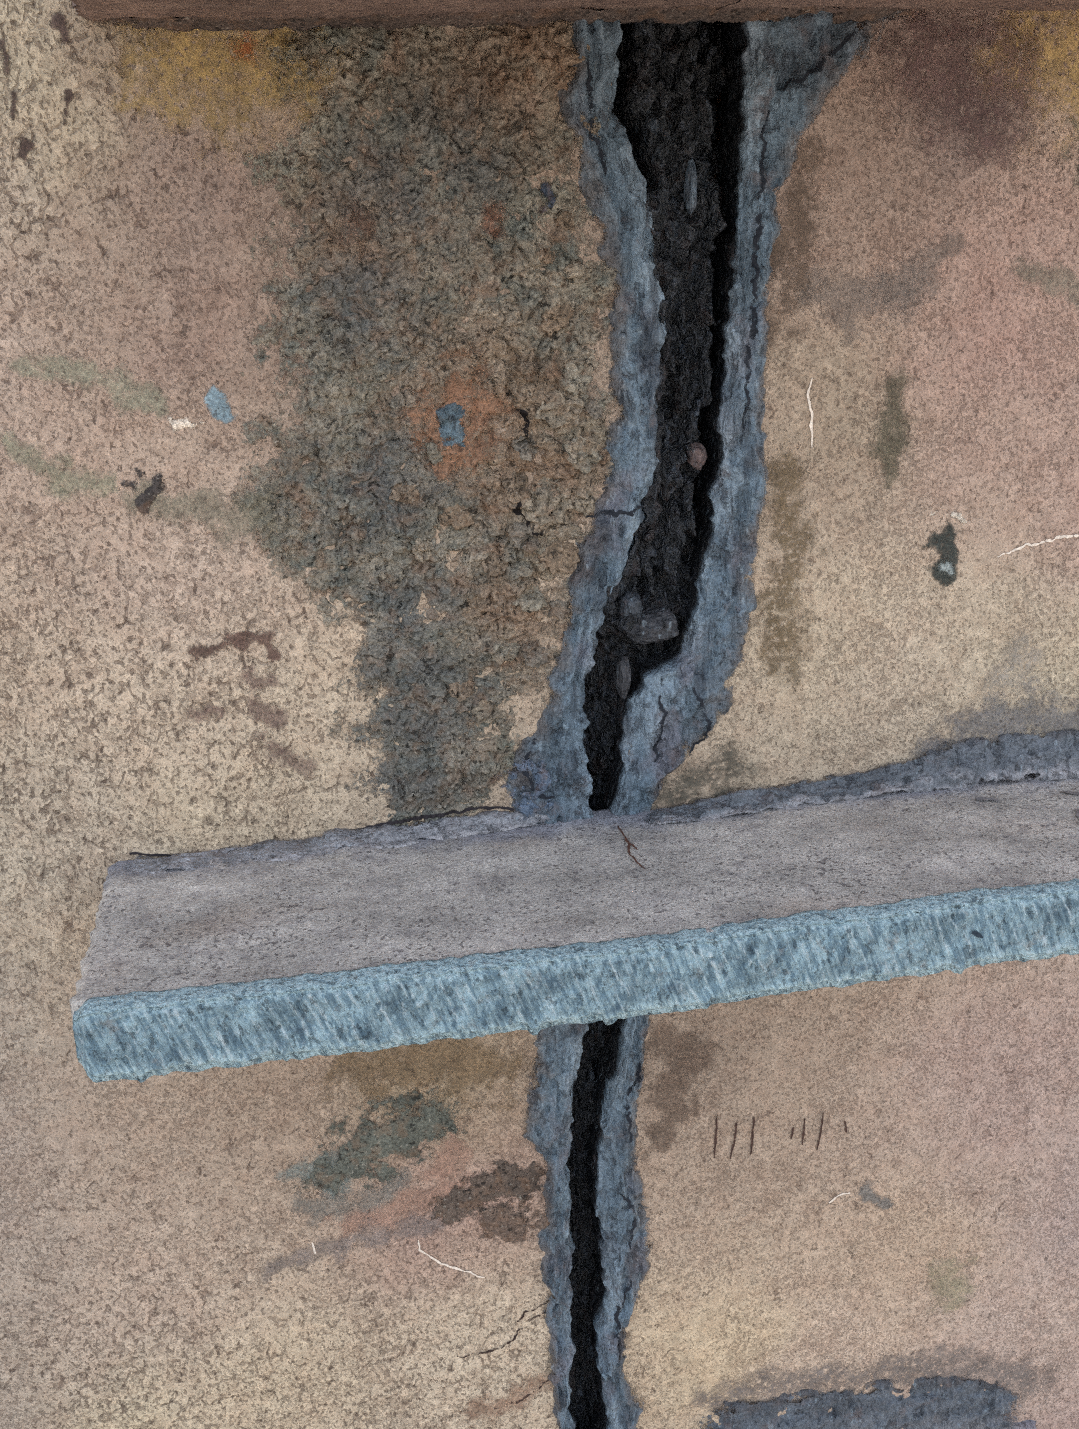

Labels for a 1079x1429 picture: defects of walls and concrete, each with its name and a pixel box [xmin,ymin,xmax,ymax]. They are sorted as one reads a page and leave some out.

crack [358,0,902,869]
crack [129,850,178,858]
crack [457,1015,653,1429]